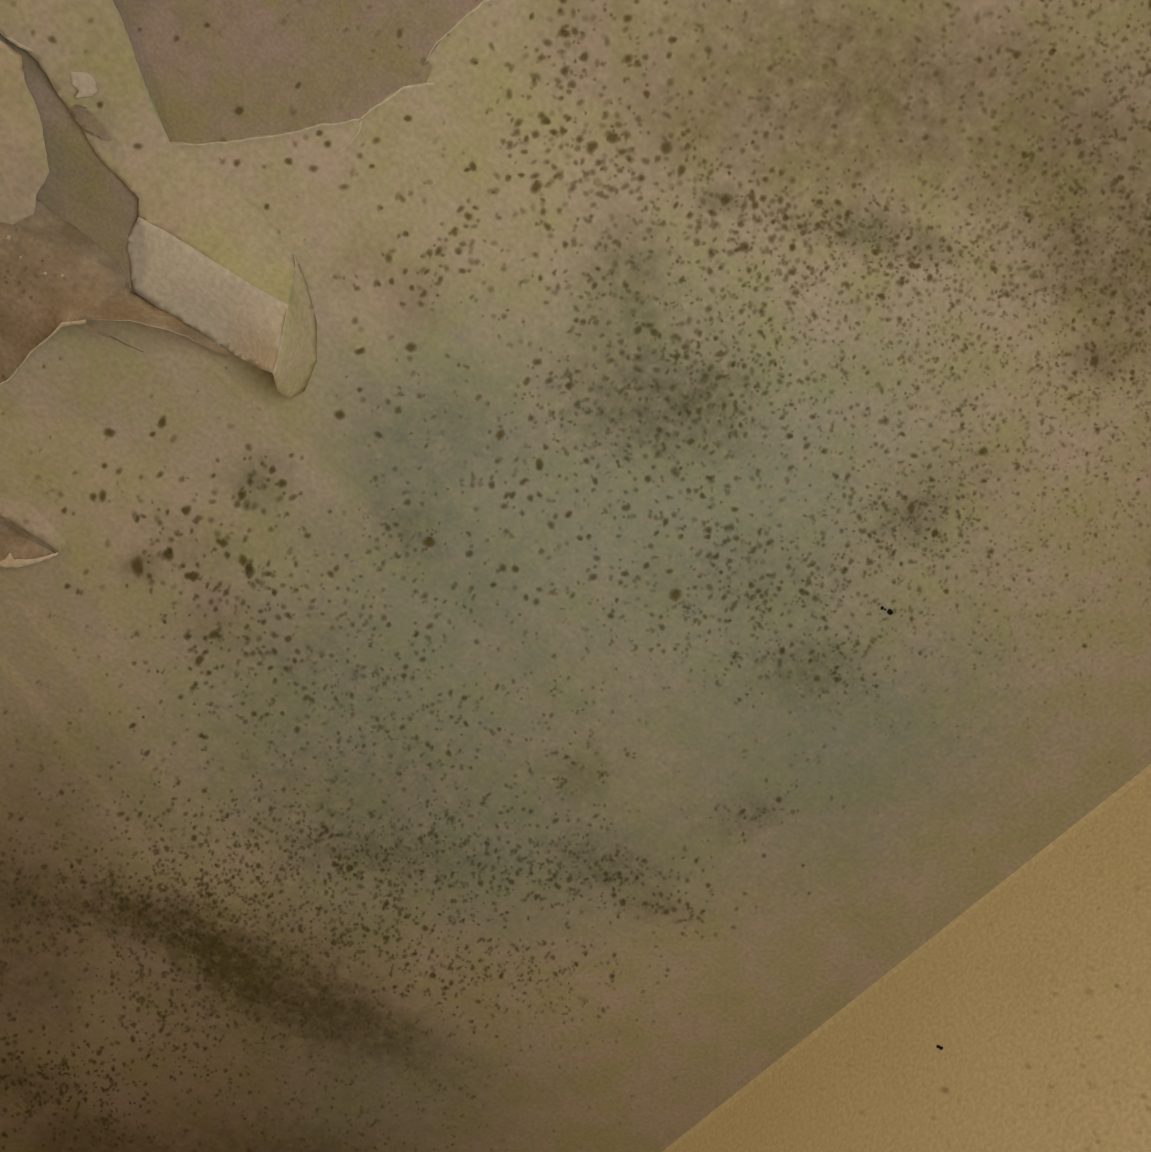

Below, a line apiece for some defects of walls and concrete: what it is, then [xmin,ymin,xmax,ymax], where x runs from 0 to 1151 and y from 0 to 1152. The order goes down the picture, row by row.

peeling [113,0,490,157]
peeling [5,38,150,303]
leakage [516,114,570,153]
leakage [579,134,630,171]
leakage [722,177,790,226]
peeling [0,497,68,568]
leakage [133,550,172,577]
leakage [217,539,275,594]
leakage [185,631,220,685]
leakage [318,855,439,966]
leakage [0,1014,173,1149]